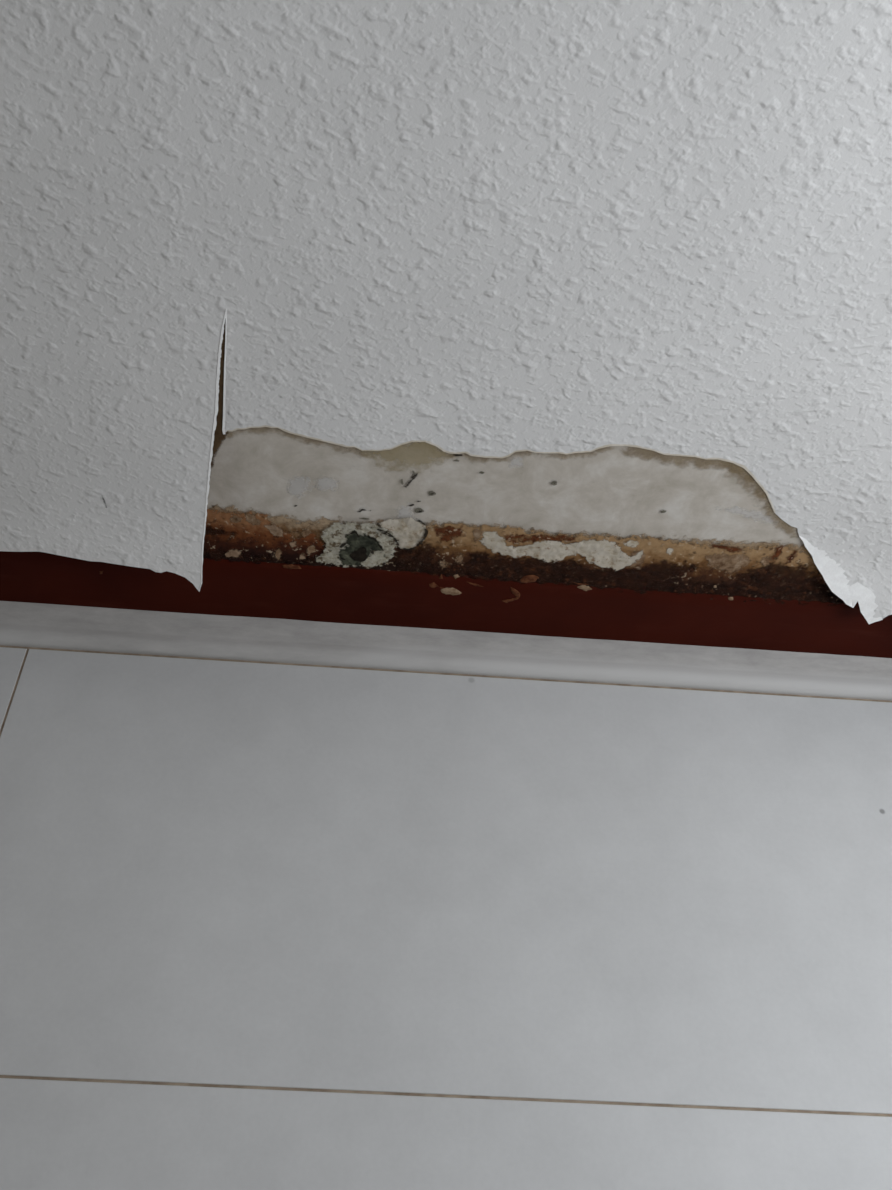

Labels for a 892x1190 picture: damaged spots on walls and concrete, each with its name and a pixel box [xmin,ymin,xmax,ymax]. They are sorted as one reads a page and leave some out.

leakage [228,427,531,488]
peeling [205,428,842,603]
leakage [316,447,844,606]